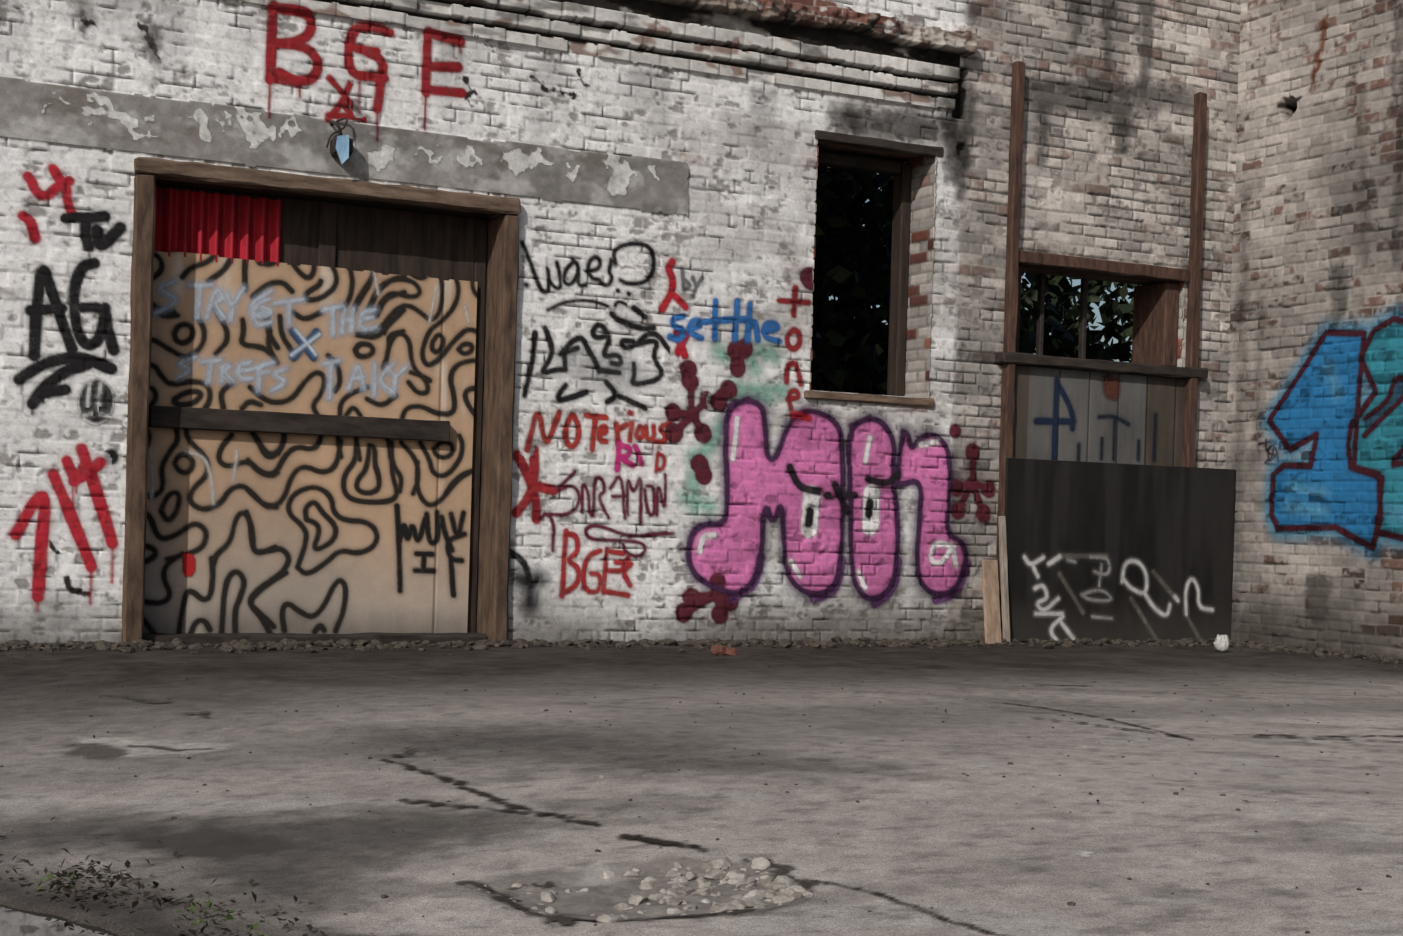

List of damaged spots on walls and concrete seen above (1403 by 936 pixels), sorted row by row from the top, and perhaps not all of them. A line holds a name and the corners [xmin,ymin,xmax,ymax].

damp [1024,0,1187,164]
peeling [41,92,157,140]
peeling [189,106,301,149]
peeling [353,140,395,172]
peeling [413,144,483,168]
peeling [501,148,580,182]
peeling [604,149,660,196]
damp [1328,266,1347,321]